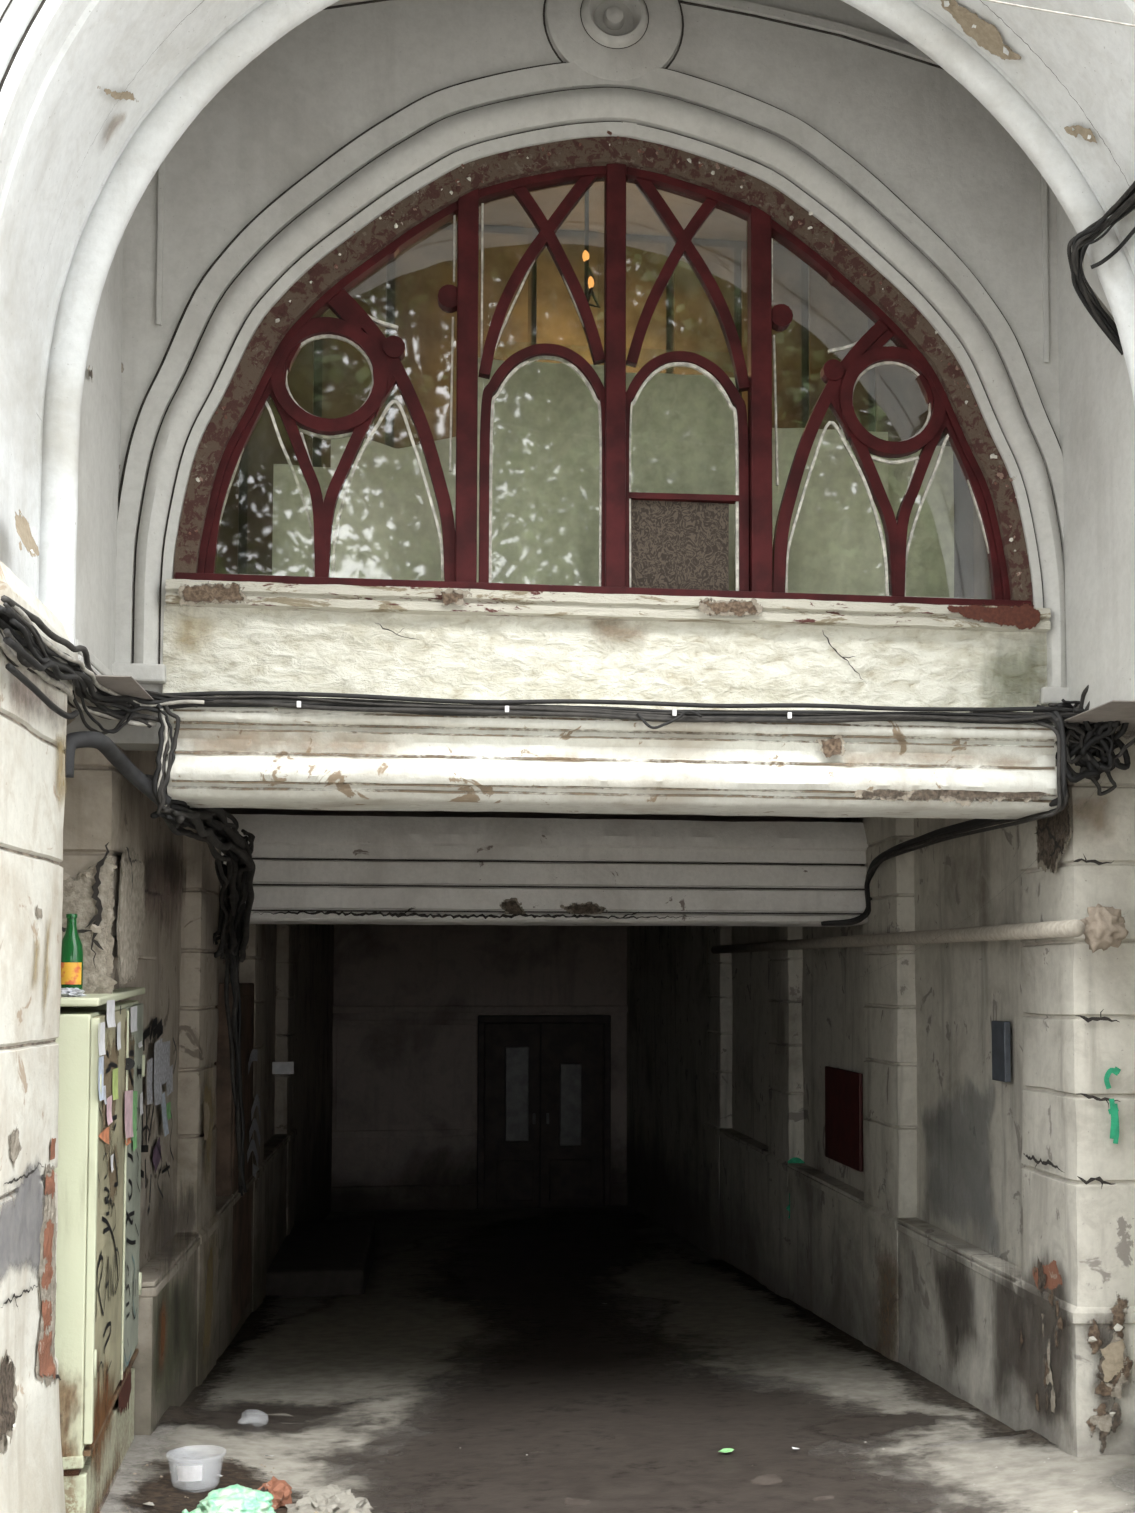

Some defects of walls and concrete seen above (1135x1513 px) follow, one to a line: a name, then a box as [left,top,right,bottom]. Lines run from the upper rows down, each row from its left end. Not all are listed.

peeling [941,0,1021,60]
peeling [97,86,136,101]
crack [980,0,1130,187]
peeling [947,603,1041,630]
crack [62,842,165,968]
crack [1075,1009,1119,1022]
crack [1078,1093,1120,1108]
crack [1024,1153,1114,1189]
flaking render [0,1138,57,1454]
water stain [992,1271,1019,1397]
flaking render [1015,1259,1133,1453]